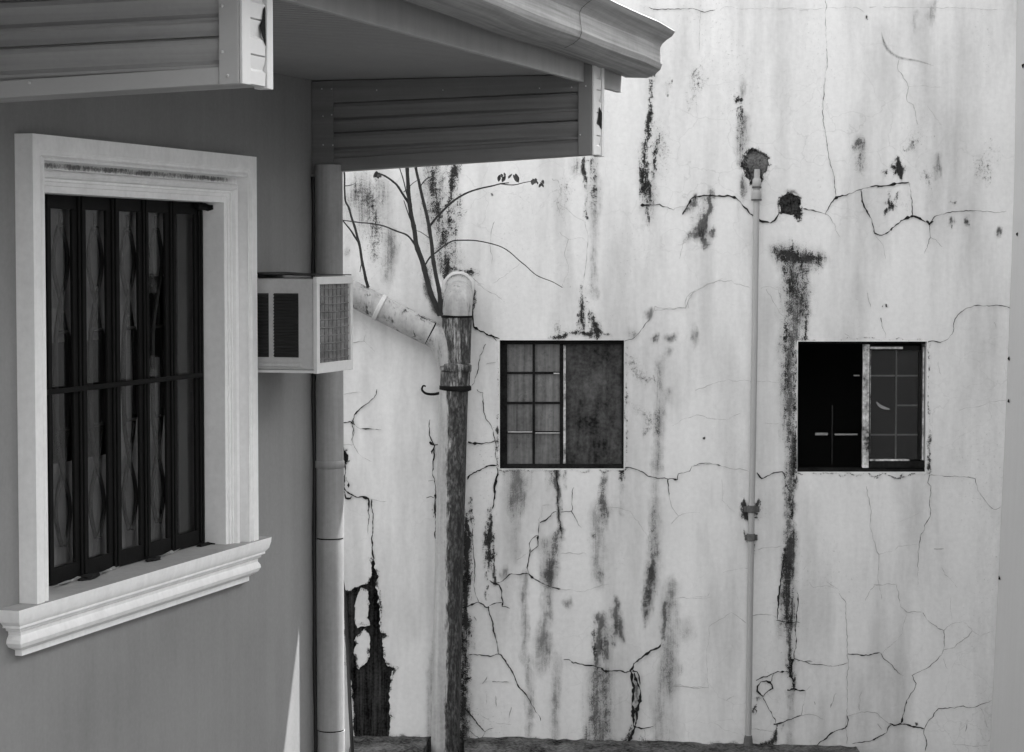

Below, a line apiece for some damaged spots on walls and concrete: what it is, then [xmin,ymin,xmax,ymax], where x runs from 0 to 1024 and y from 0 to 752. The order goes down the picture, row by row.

water stain [424,164,477,313]
water stain [639,75,669,226]
water stain [685,190,715,249]
spalling [740,147,772,186]
spalling [777,191,803,222]
crack [641,97,1000,259]
water stain [772,243,823,691]
spalling [344,558,399,737]
water stain [460,497,497,740]
crack [463,471,607,720]
crack [564,623,670,741]
crack [668,475,1000,750]